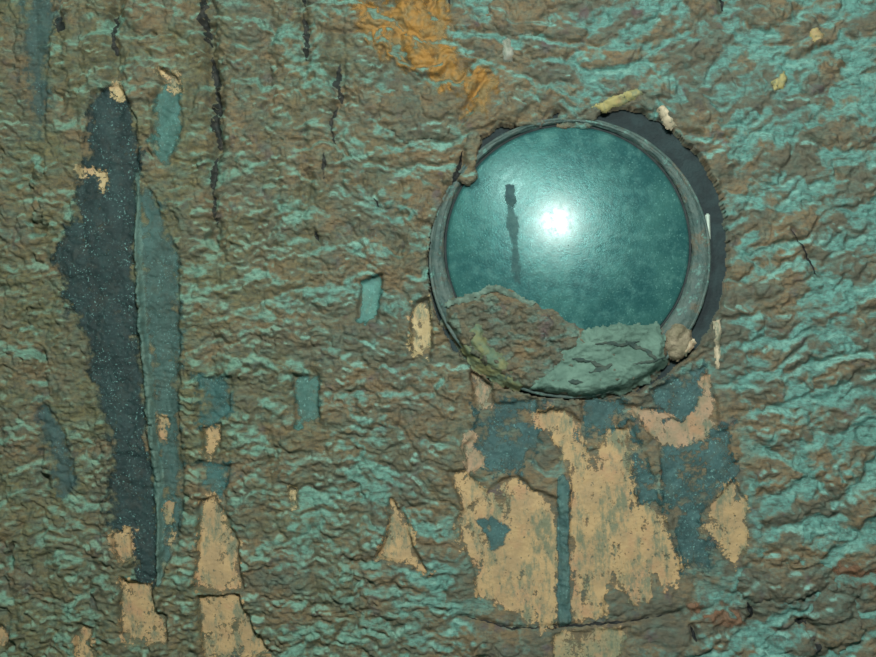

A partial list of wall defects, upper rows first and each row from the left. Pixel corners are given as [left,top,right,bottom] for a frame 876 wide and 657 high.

crack [302,0,310,61]
crack [196,0,223,225]
crack [321,64,344,179]
spalling [50,64,272,657]
spalling [34,404,79,498]
peeling [375,498,436,577]
peeling [452,319,751,657]